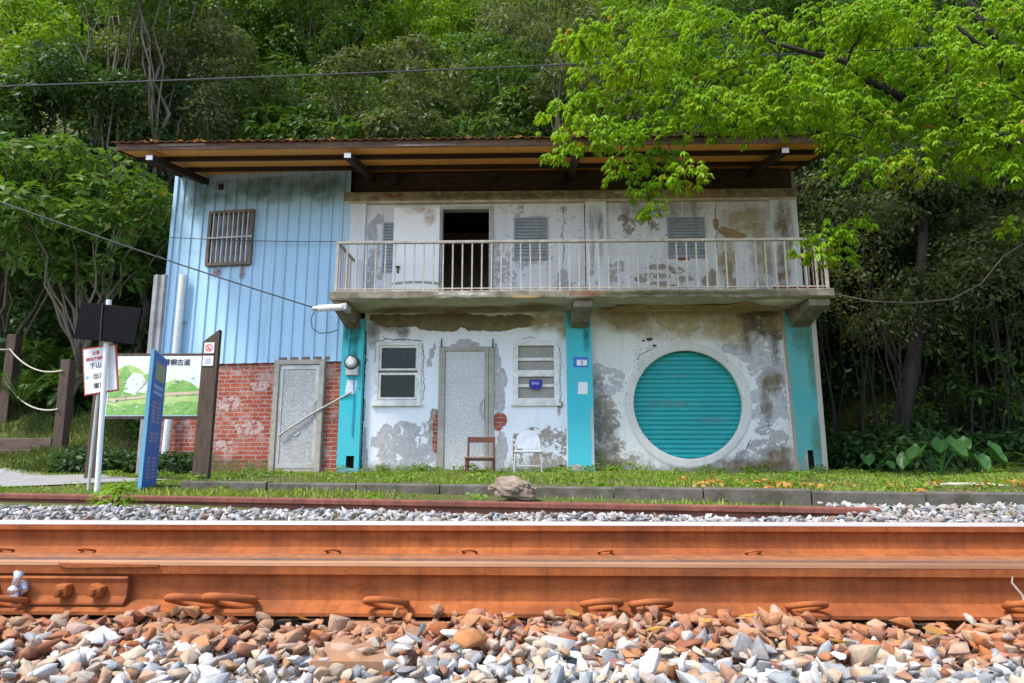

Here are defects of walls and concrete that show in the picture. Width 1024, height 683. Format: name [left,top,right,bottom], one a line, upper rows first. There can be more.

peeling [366,213,385,291]
peeling [617,214,660,235]
peeling [590,252,737,289]
damp [729,207,792,285]
damp [345,305,566,356]
efflorescence [250,381,270,391]
flaking render [359,313,640,471]
damp [212,396,264,458]
damp [593,383,622,470]
damp [698,448,789,472]